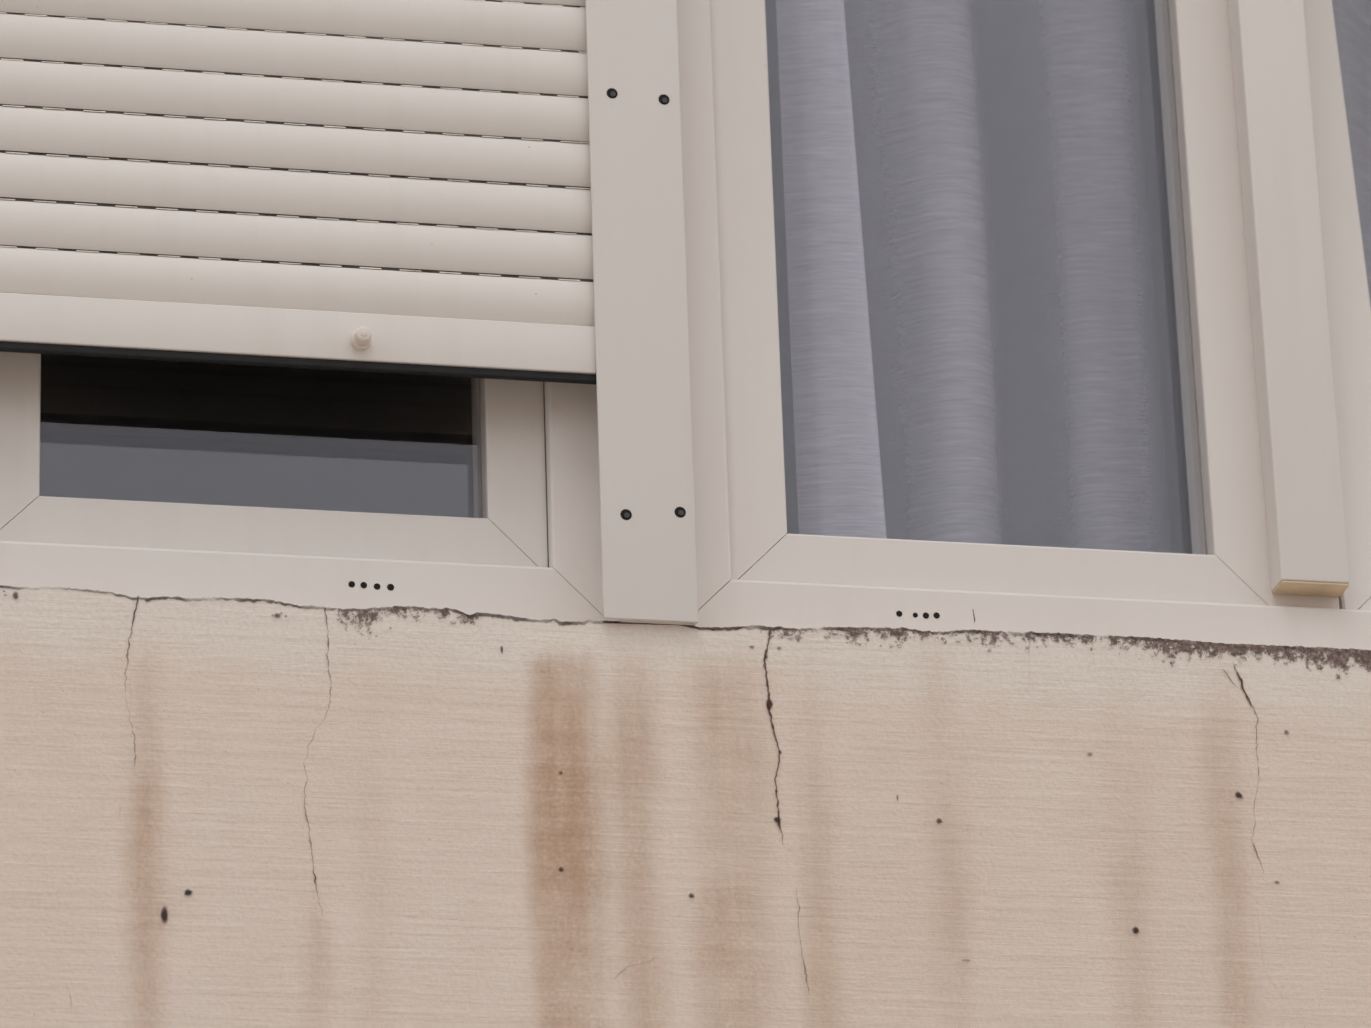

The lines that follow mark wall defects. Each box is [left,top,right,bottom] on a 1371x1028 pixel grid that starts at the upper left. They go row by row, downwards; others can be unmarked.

crack [68,588,186,661]
crack [220,597,1076,850]
crack [1128,636,1258,744]
crack [304,781,317,890]